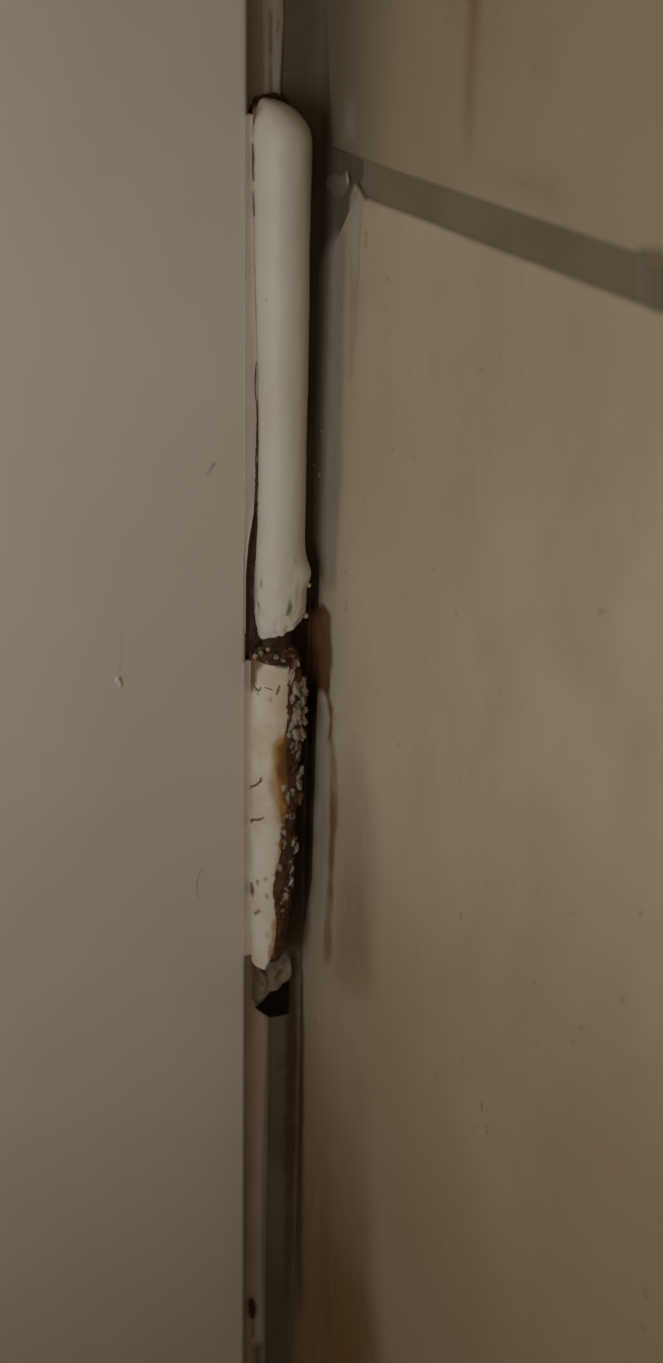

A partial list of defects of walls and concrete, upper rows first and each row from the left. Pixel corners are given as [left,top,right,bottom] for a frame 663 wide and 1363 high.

peeling [253,647,309,936]
rust [251,603,332,816]